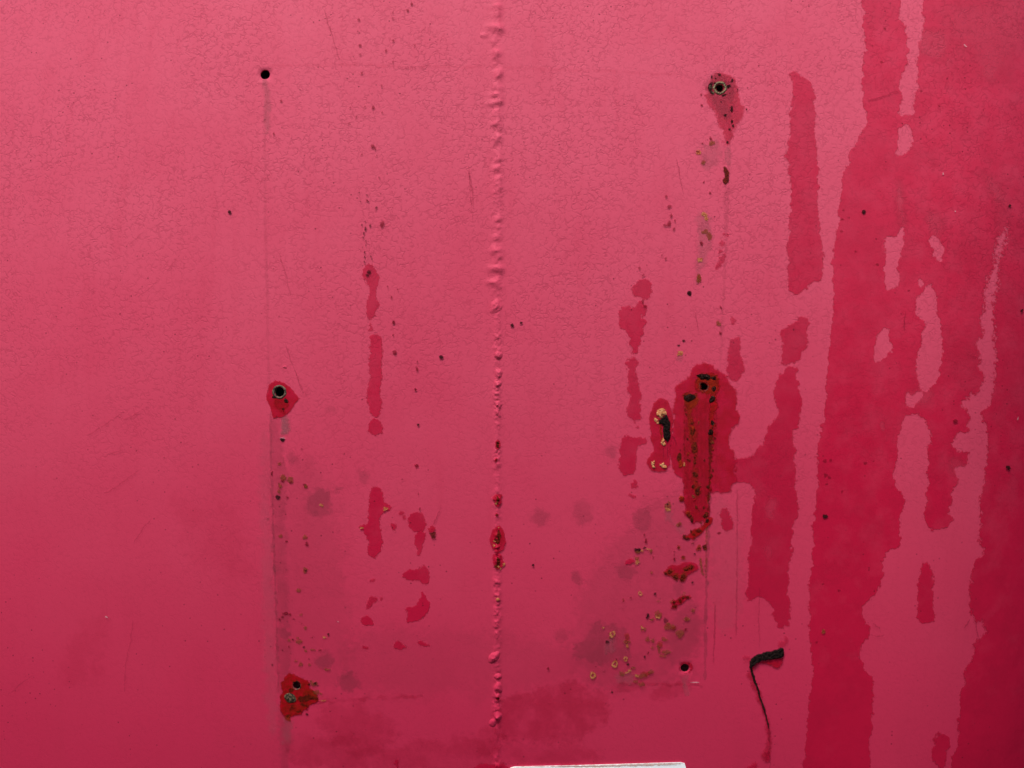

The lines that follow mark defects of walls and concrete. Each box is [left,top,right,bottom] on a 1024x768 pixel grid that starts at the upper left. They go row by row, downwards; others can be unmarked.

rust [696,73,738,164]
rust [687,212,712,296]
rust [650,363,740,583]
rust [279,612,329,721]
rust [602,627,653,686]
rust [641,596,695,658]